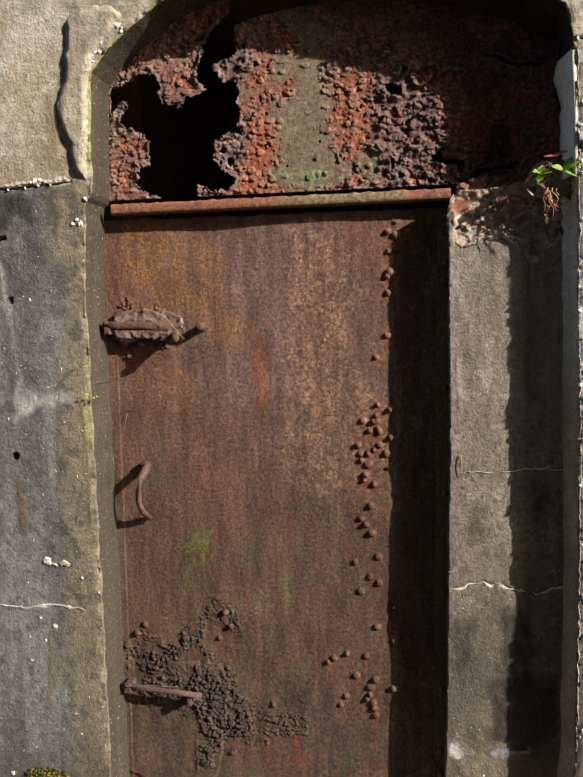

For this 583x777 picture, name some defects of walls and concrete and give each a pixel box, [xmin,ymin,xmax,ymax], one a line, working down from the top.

spalling [447,159,583,265]
crack [452,36,583,751]
crack [0,602,84,610]